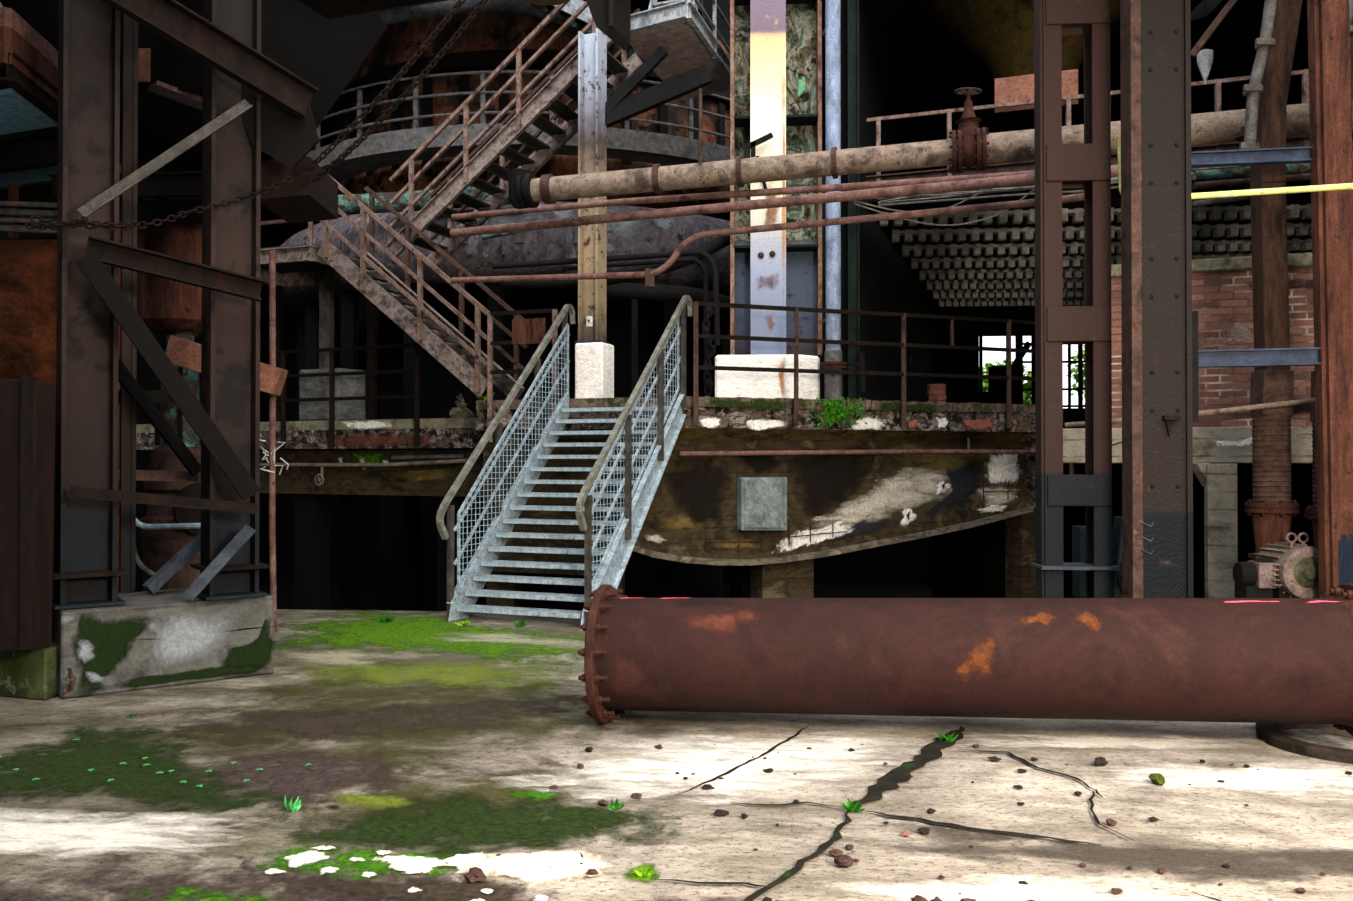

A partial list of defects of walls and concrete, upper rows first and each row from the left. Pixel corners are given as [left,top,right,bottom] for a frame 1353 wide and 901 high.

corrosion [765,180,786,261]
spalling [936,481,951,495]
spalling [901,508,916,525]
spalling [789,524,847,546]
corrosion [1022,613,1053,624]
corrosion [1079,612,1100,630]
water stain [80,618,261,690]
corrosion [957,639,994,676]
crack [654,725,1134,901]